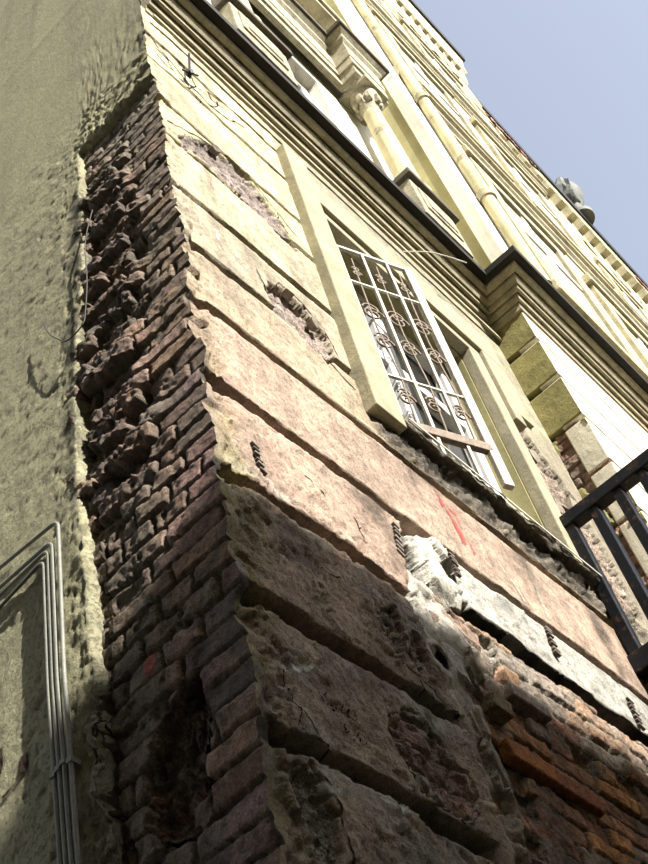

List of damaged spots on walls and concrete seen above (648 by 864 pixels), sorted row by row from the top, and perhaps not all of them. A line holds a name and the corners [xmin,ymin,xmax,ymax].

spalling [265,288,330,363]
spalling [66,78,295,864]
peeling [520,423,612,515]
peeling [604,507,648,589]
crack [283,669,356,864]
spalling [379,570,648,864]